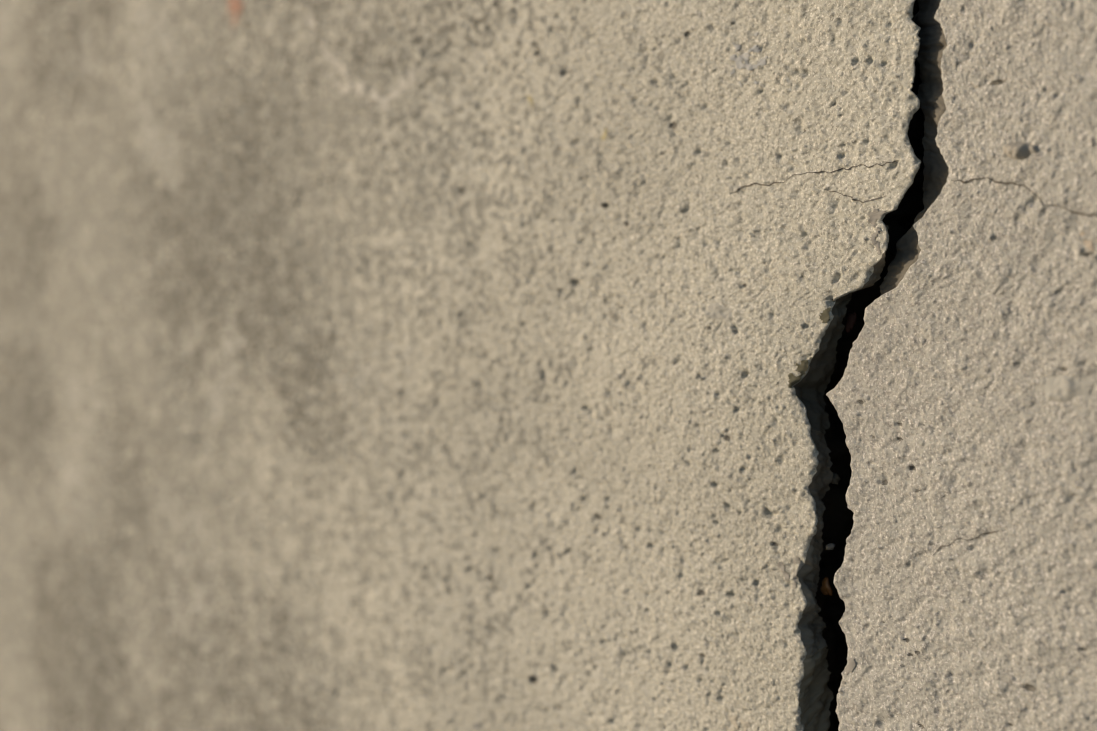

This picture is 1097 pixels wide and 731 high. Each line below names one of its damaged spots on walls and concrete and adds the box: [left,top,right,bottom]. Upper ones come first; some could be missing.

crack [729,0,1097,731]